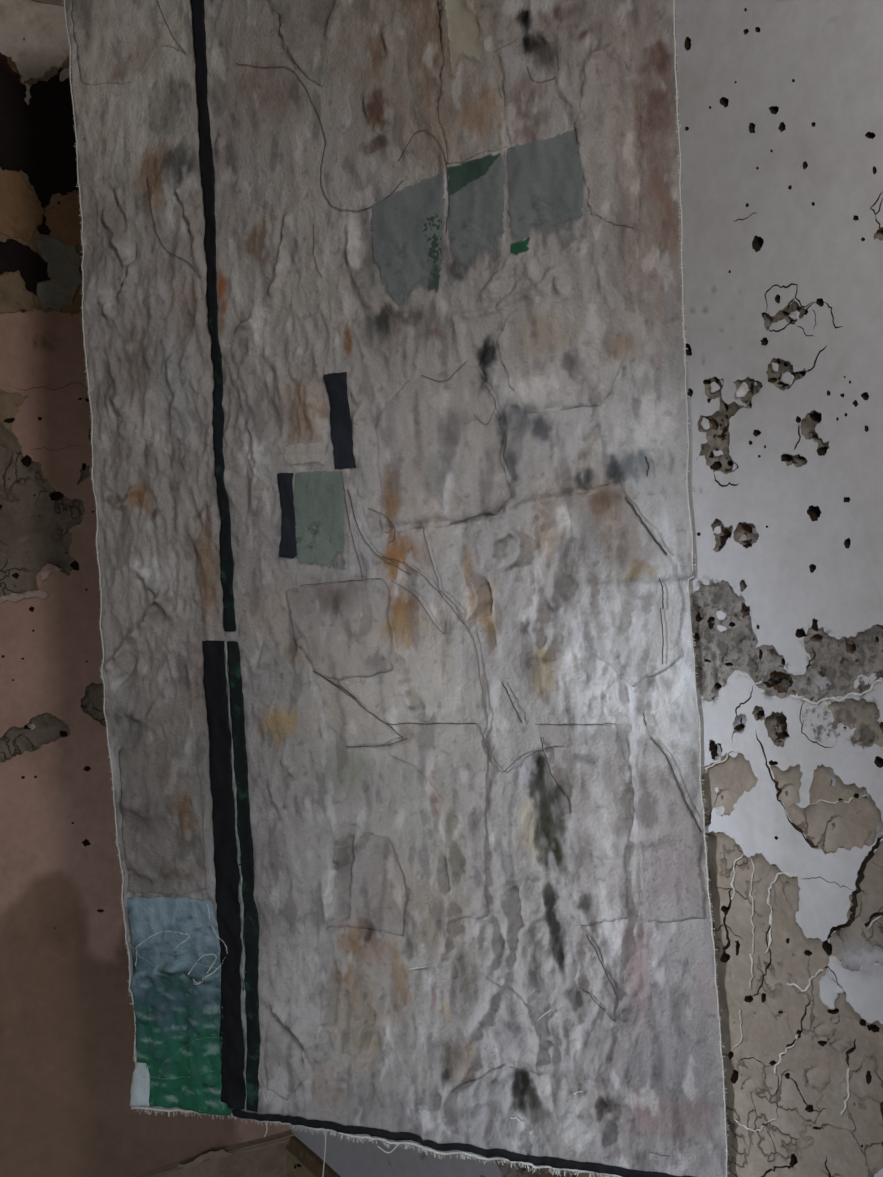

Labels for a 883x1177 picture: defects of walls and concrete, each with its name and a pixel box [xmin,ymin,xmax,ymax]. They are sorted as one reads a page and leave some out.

peeling [0,0,70,86]
peeling [0,190,79,264]
flaking render [761,283,843,337]
flaking render [696,345,830,487]
flaking render [0,389,91,603]
flaking render [711,518,759,552]
flaking render [0,713,70,763]
flaking render [80,682,106,727]
flaking render [691,579,883,748]
crack [732,687,883,994]
flaking render [702,739,883,1177]
spalling [495,1160,529,1177]